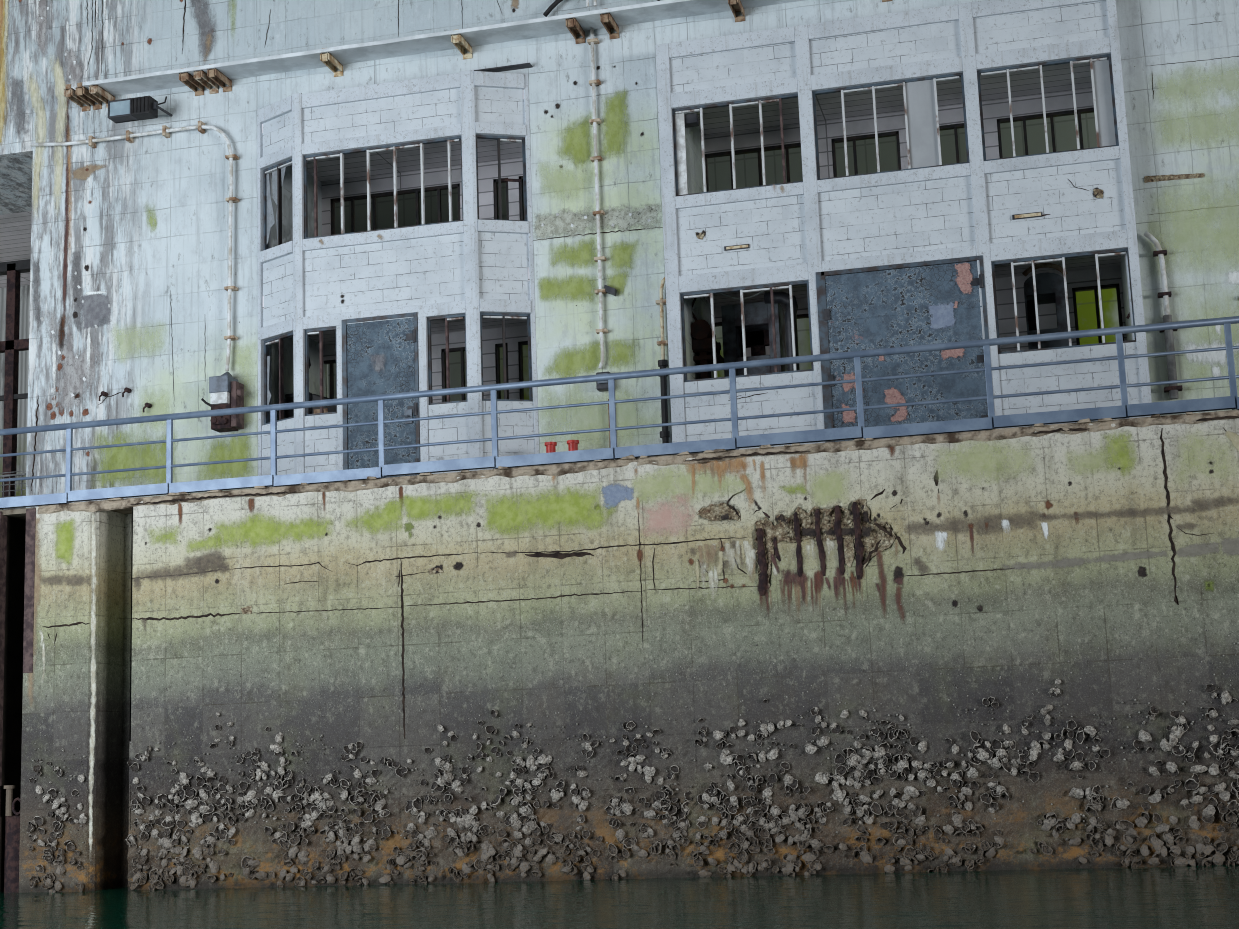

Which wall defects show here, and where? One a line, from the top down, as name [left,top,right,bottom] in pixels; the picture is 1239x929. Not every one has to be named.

rust [57,98,104,371]
peeling [929,263,972,329]
peeling [941,348,965,360]
rust [47,387,89,420]
rust [689,458,765,500]
rust [790,455,807,478]
spalling [698,488,903,596]
crack [886,522,1015,576]
crack [1160,428,1179,605]
rust [760,552,904,618]
crack [131,537,758,739]